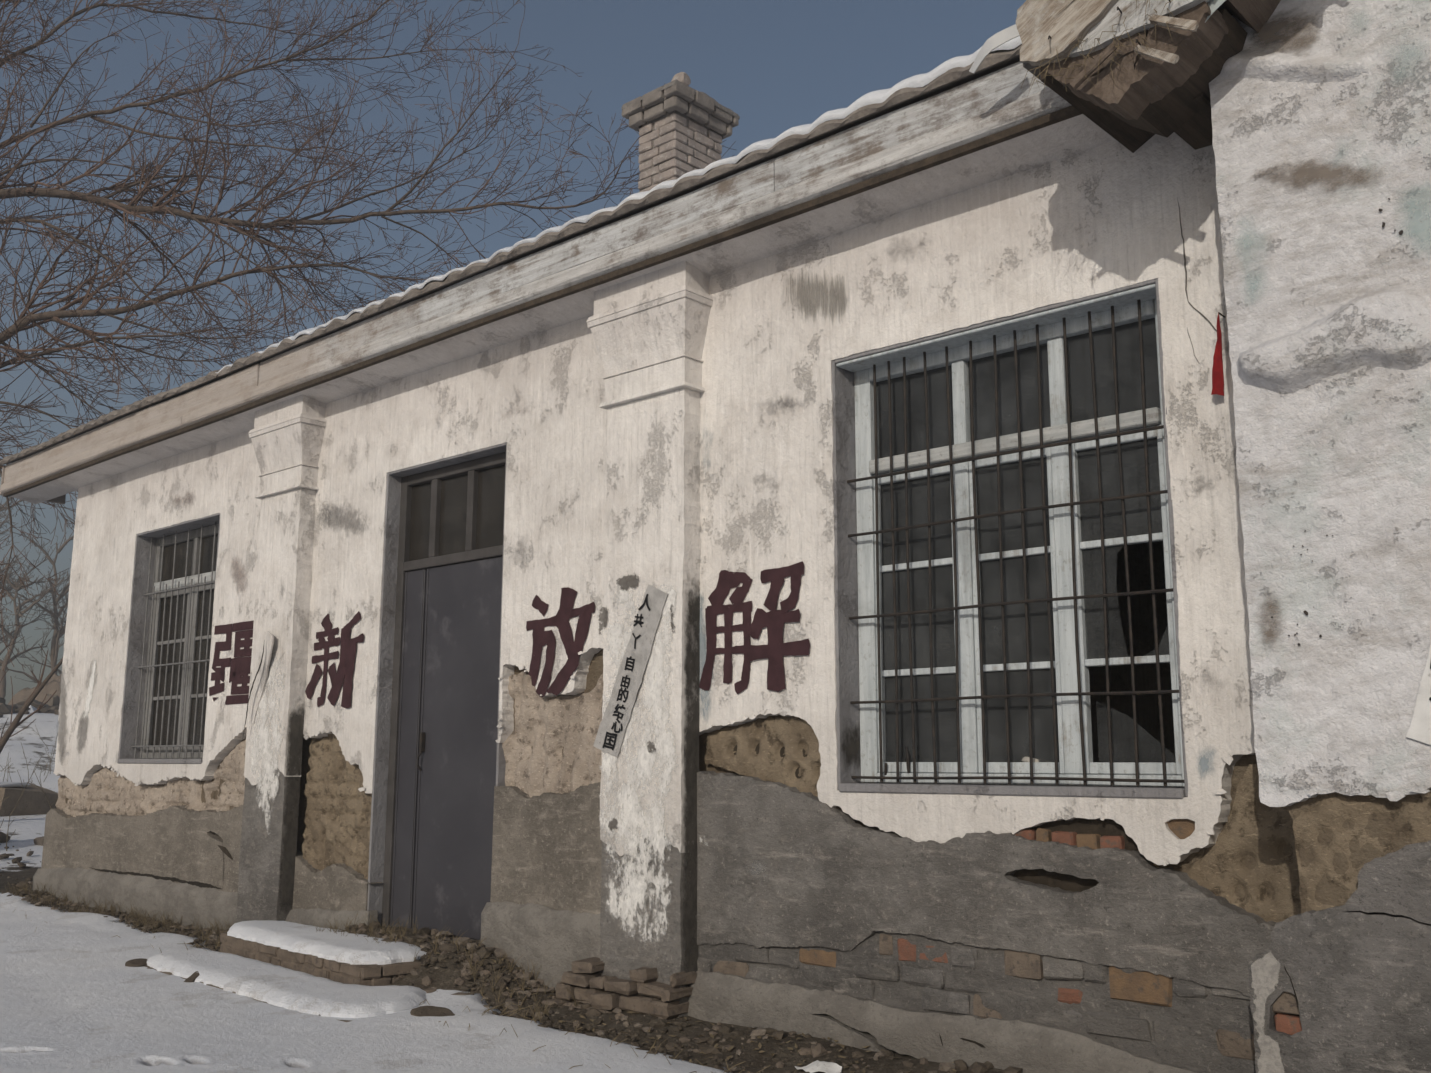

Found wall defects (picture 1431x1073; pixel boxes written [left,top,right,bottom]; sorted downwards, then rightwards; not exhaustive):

leakage [1259,161,1369,189]
crack [1177,199,1217,364]
flaking render [55,631,284,827]
flaking render [302,730,372,880]
peeling [497,574,677,941]
flaking render [699,597,821,797]
spalling [1013,869,1099,892]
flaking render [1015,817,1139,851]
flaking render [1153,754,1431,922]